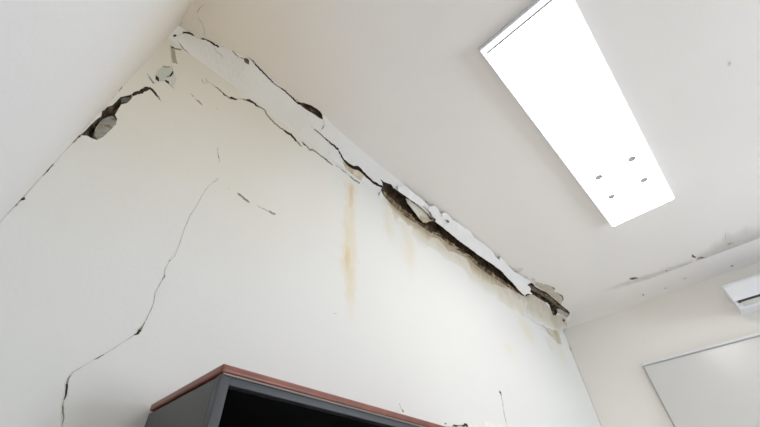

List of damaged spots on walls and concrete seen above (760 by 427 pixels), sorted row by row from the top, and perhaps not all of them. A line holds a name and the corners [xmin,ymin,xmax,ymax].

crack [0,135,81,222]
spalling [81,45,182,140]
crack [62,147,276,425]
leakage [337,171,362,326]
peeling [338,150,569,328]
leakage [378,191,574,377]